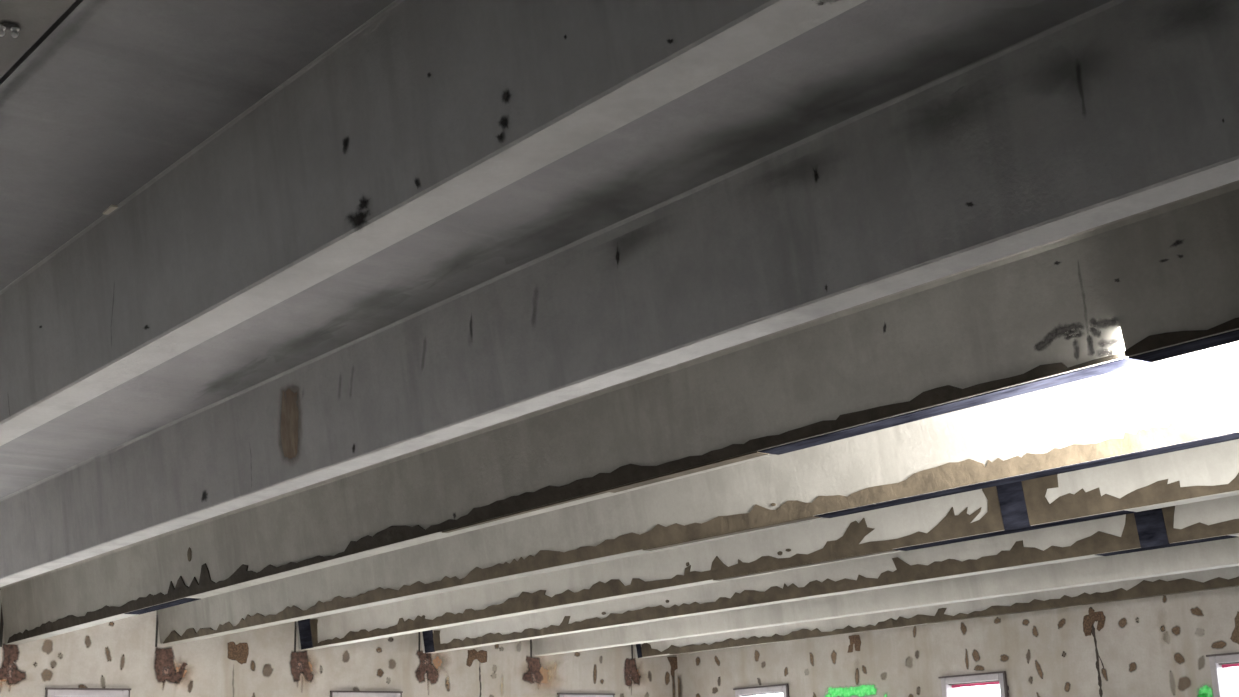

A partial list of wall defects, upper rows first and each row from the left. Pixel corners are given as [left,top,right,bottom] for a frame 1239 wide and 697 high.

rust [280,388,299,461]
spalling [1083,608,1127,636]
spalling [1211,611,1239,649]
rust [0,644,26,684]
rust [154,647,189,684]
rust [290,651,314,682]
rust [523,656,555,688]